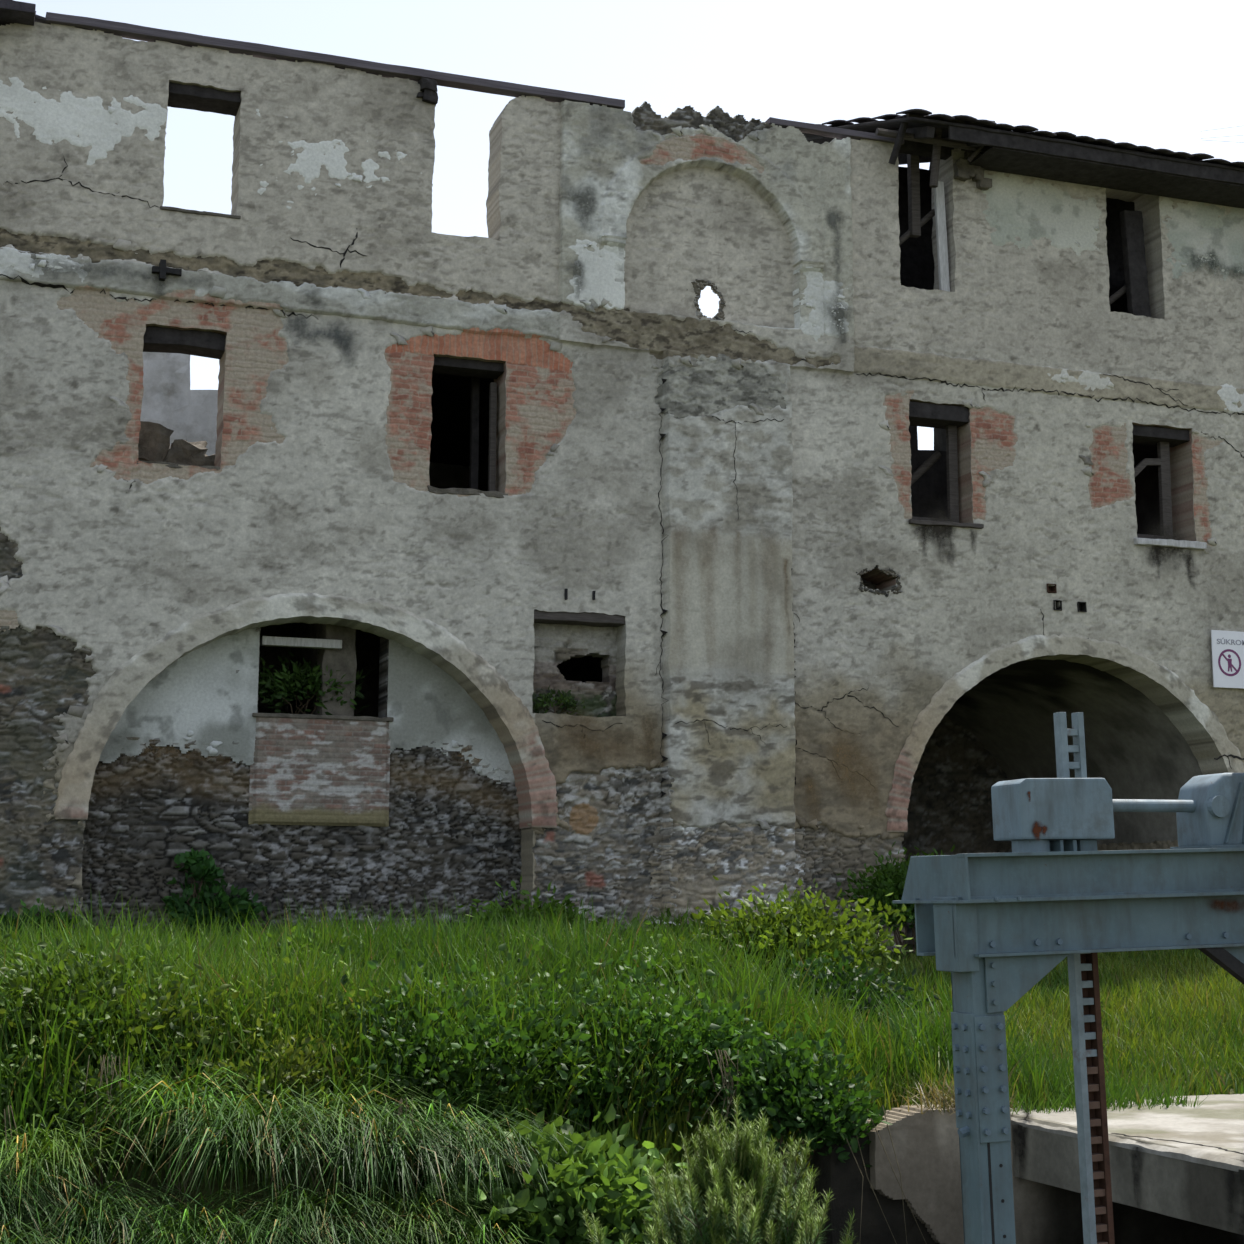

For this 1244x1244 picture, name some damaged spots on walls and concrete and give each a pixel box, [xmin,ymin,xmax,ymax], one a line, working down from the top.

crack [4,159,158,208]
peeling [0,77,168,165]
peeling [257,139,407,209]
crack [291,228,366,268]
flaking render [0,228,854,496]
flaking render [878,390,914,519]
flaking render [962,399,1018,520]
flaking render [0,527,23,595]
crack [655,378,898,797]
leakage [916,513,952,550]
flaking render [0,610,96,936]
flaking render [527,760,905,958]